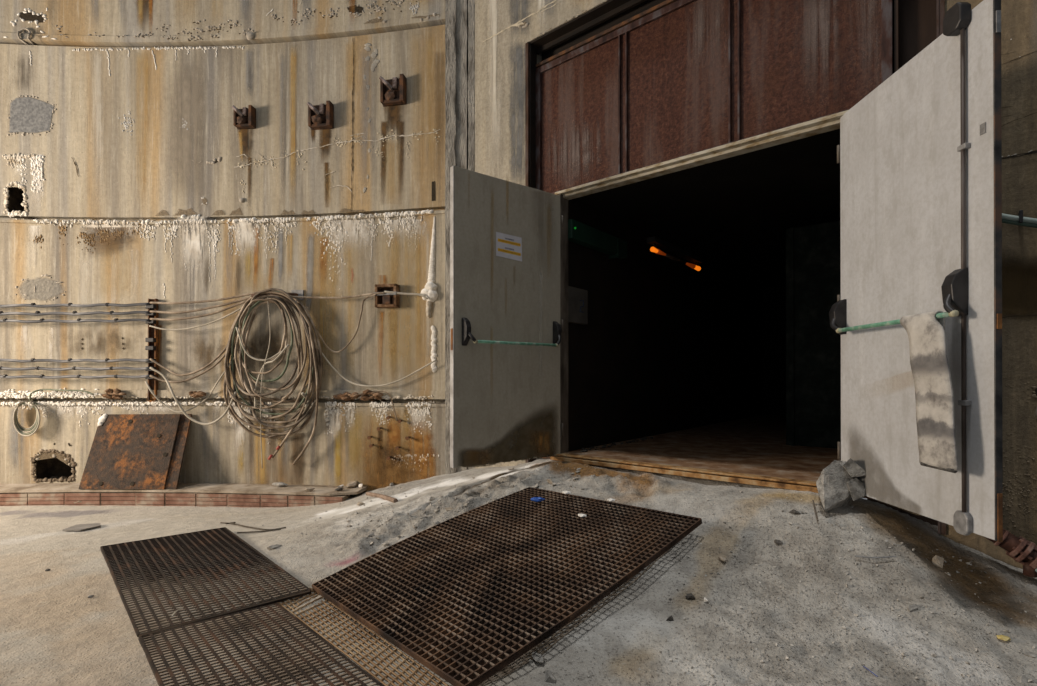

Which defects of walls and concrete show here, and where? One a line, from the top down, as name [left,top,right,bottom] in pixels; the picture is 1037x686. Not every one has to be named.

spalling [4,8,68,45]
corrosion [137,0,153,18]
spalling [88,19,254,41]
leakage [2,153,45,194]
corrosion [239,129,252,193]
corrosion [381,105,403,185]
crack [1002,150,1037,159]
spalling [3,181,35,219]
leakage [8,209,438,373]
leakage [1002,261,1037,317]
leakage [461,410,555,467]
spalling [30,449,77,483]